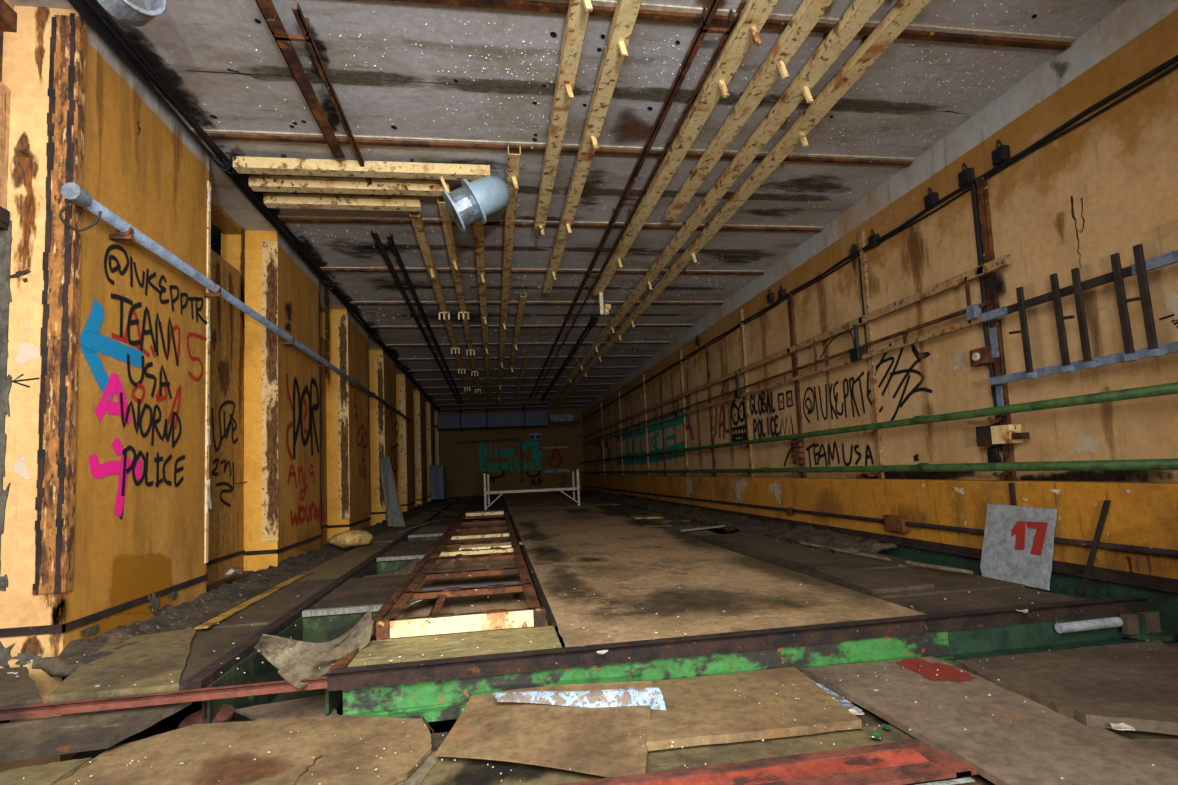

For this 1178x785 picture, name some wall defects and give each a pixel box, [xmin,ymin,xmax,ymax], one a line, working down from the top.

corrosion [35,7,50,79]
corrosion [10,132,38,283]
leakage [518,171,646,205]
leakage [747,176,843,216]
peeling [32,13,76,595]
spalling [0,229,12,534]
spalling [0,560,8,591]
spalling [0,641,42,668]